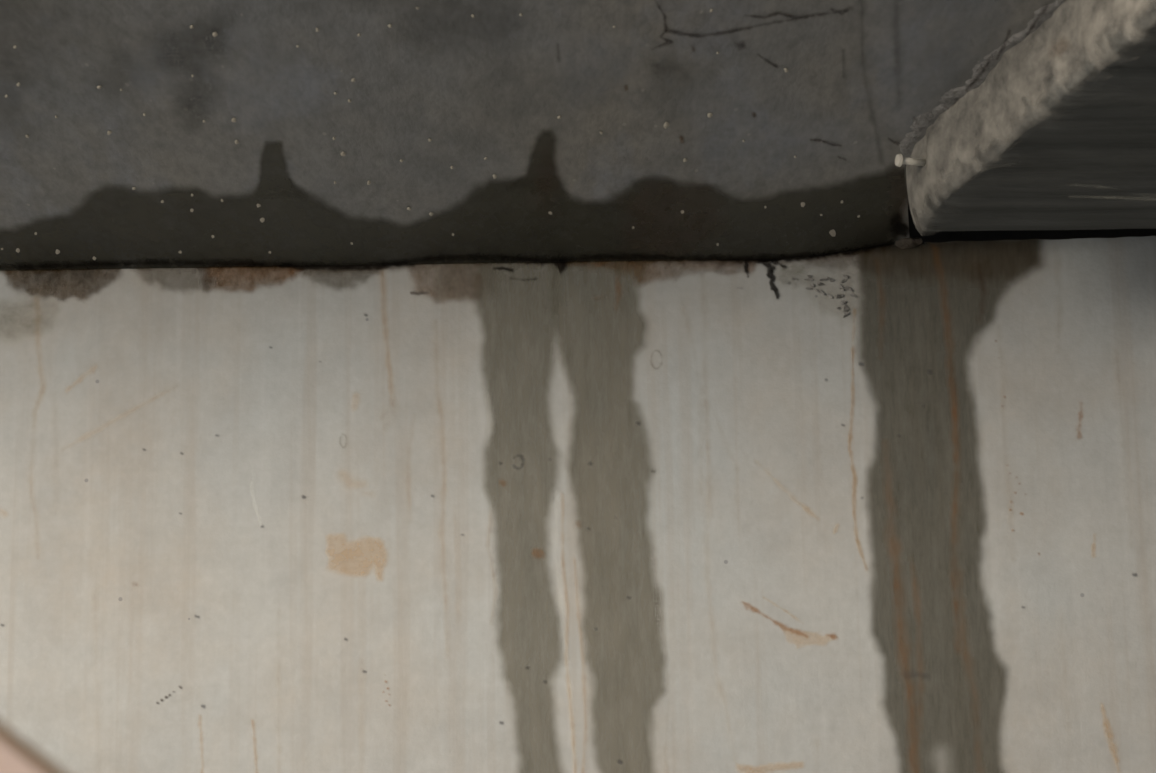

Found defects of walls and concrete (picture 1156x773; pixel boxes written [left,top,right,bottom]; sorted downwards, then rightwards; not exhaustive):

crack [664,9,833,45]
water stain [0,132,1040,773]